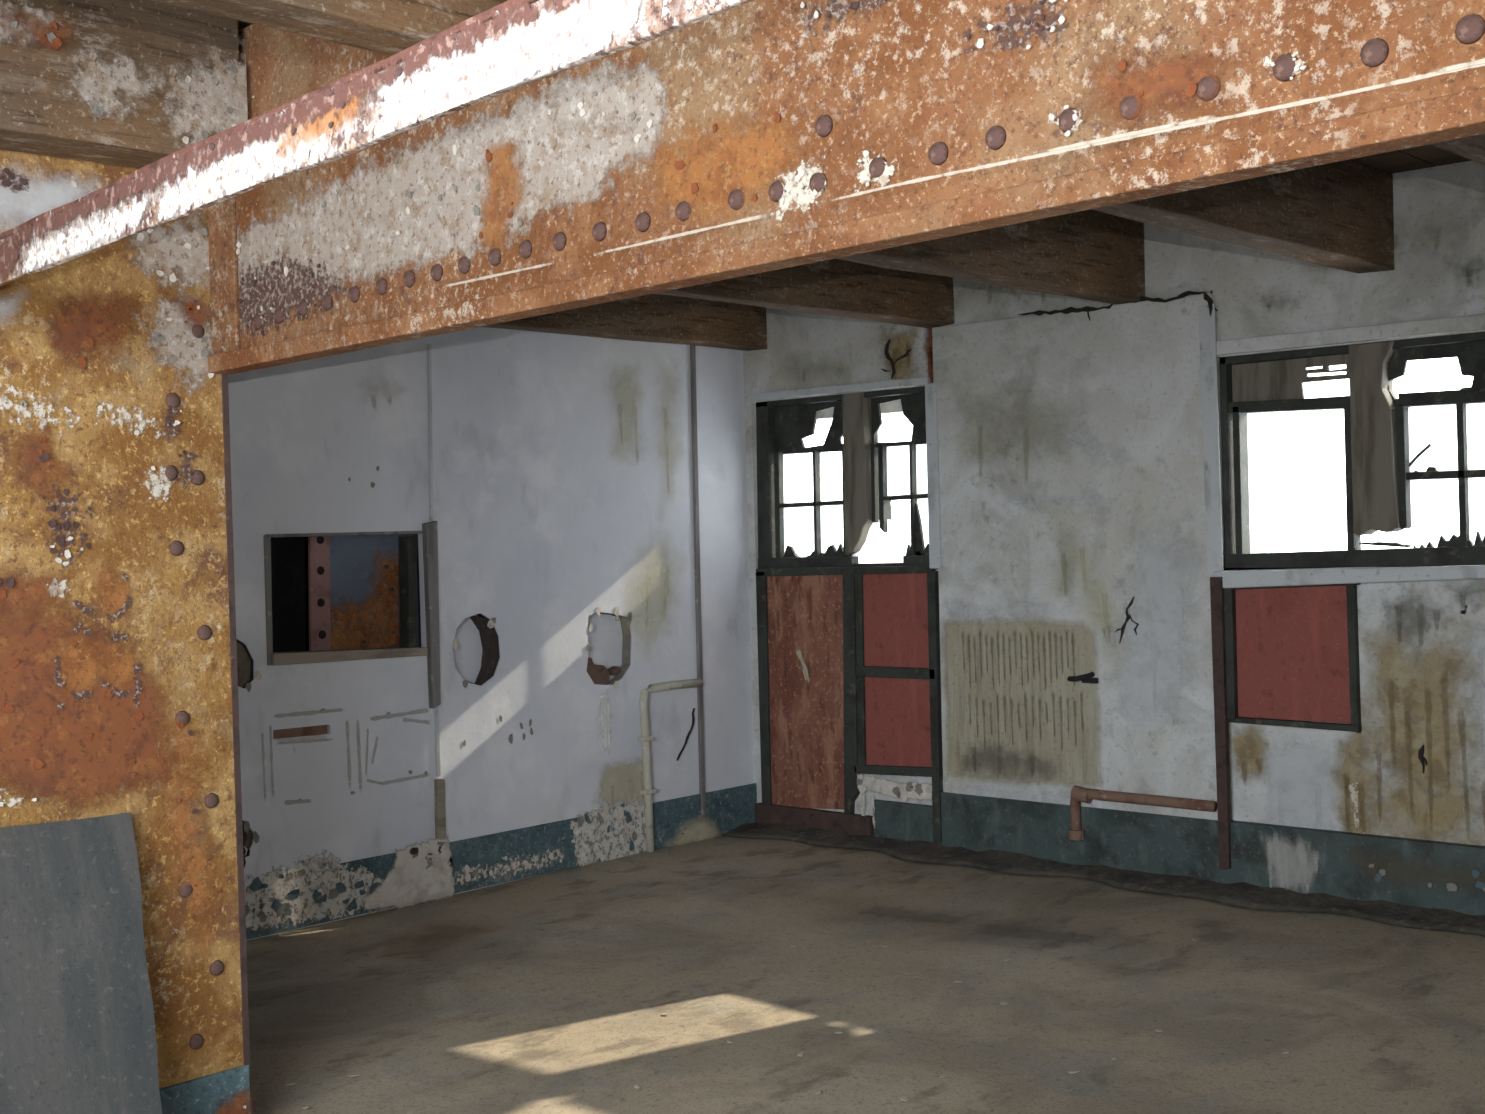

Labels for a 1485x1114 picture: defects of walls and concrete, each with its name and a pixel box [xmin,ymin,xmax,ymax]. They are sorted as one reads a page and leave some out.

rust [959,0,1080,55]
rust [0,0,580,281]
peeling [236,0,667,336]
rust [654,113,793,218]
peeling [840,58,1485,199]
rust [238,249,361,338]
crack [1017,290,1218,321]
spalling [586,607,632,689]
damp [946,619,1098,784]
damp [1233,728,1266,775]
damp [1336,641,1477,845]
peeling [242,799,646,937]